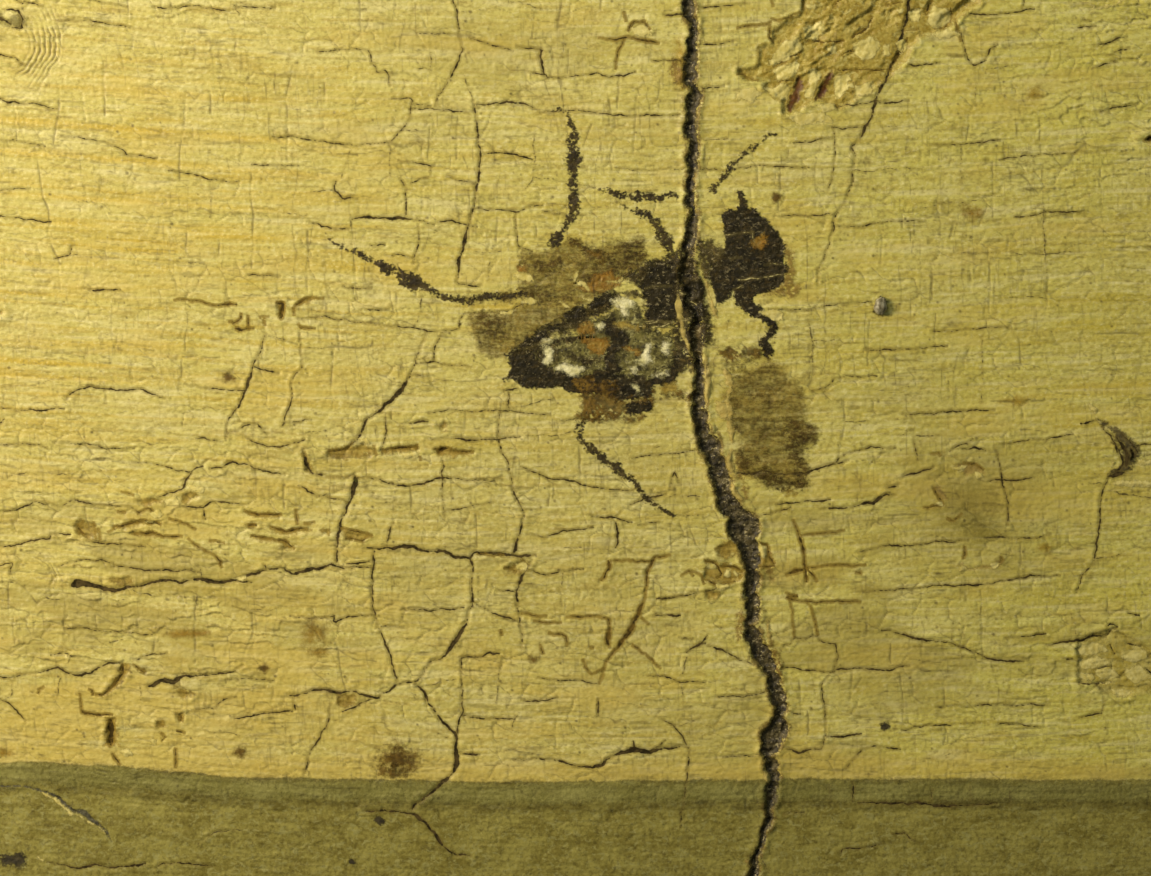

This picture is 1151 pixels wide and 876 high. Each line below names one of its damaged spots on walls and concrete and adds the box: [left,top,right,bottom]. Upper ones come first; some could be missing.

crack [0,1,41,29]
crack [0,98,54,109]
peeling [736,0,981,126]
crack [961,8,1035,95]
crack [951,139,1098,299]
crack [0,386,162,448]
crack [45,0,960,876]
crack [870,327,997,415]
crack [949,434,1071,539]
crack [0,533,71,583]
crack [866,480,1151,663]
crack [0,627,165,719]